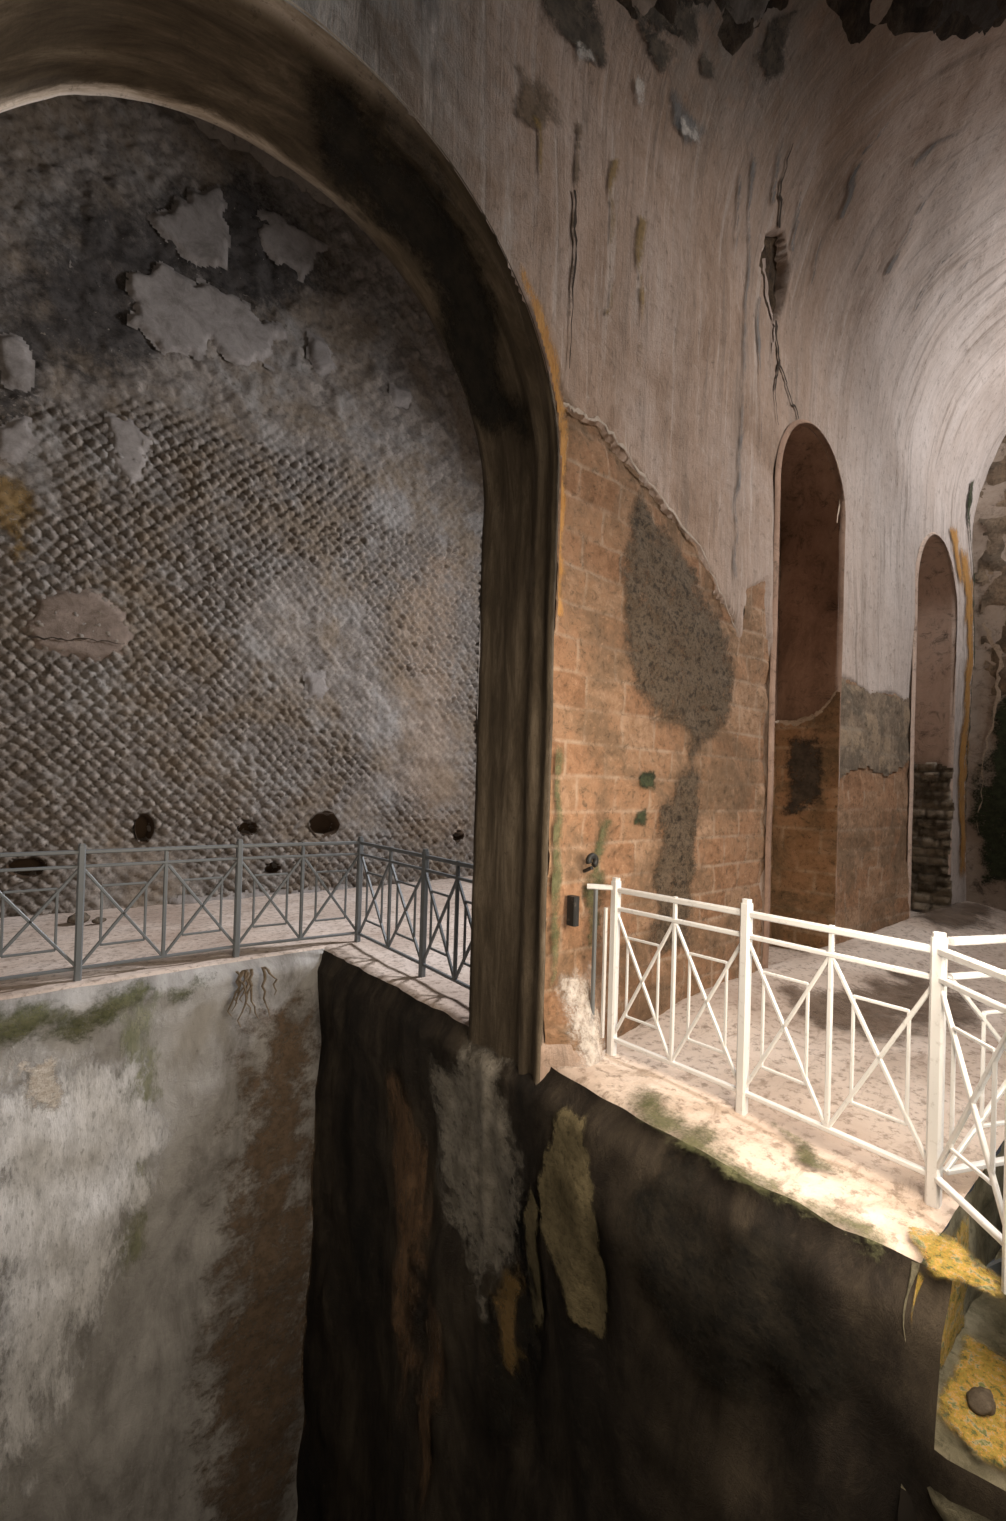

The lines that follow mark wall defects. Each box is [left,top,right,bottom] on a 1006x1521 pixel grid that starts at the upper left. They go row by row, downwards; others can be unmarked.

peeling [543,0,607,67]
peeling [616,0,789,80]
peeling [826,0,1006,44]
crack [778,144,793,228]
crack [774,320,799,425]
spalling [544,373,955,1058]
spalling [6,857,47,878]
spalling [134,813,154,844]
damp [0,1004,171,1488]
damp [192,997,321,1521]